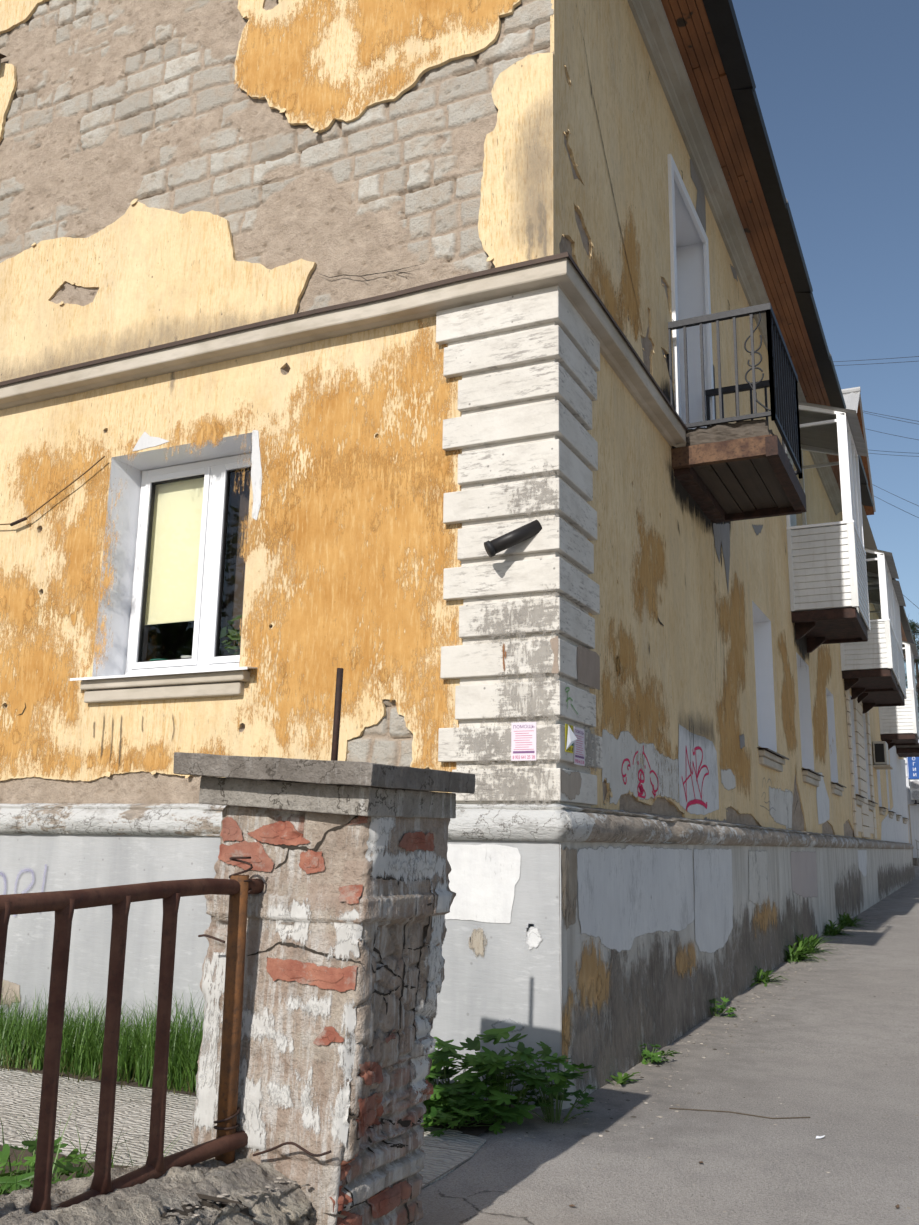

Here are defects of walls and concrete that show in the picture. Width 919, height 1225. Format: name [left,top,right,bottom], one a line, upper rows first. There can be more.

spalling [0,0,554,313]
peeling [161,319,682,817]
peeling [0,436,230,804]
flaking render [218,816,325,874]
crack [247,815,358,869]
peeling [561,847,578,930]
damp [834,866,864,920]
damp [877,861,915,900]
flaking render [266,958,357,992]
crack [248,876,435,1062]
damp [565,895,819,1099]
crack [160,1193,262,1225]